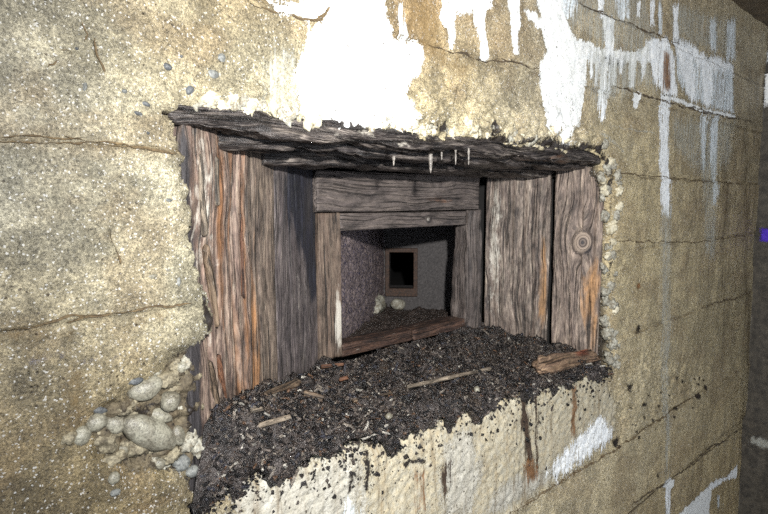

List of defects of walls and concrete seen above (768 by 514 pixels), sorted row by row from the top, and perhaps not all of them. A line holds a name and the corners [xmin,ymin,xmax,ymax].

crack [429,45,539,69]
crack [0,134,177,154]
water stain [478,0,736,382]
water stain [227,377,617,514]
crack [510,392,700,513]
crack [628,428,743,514]
water stain [663,465,738,514]